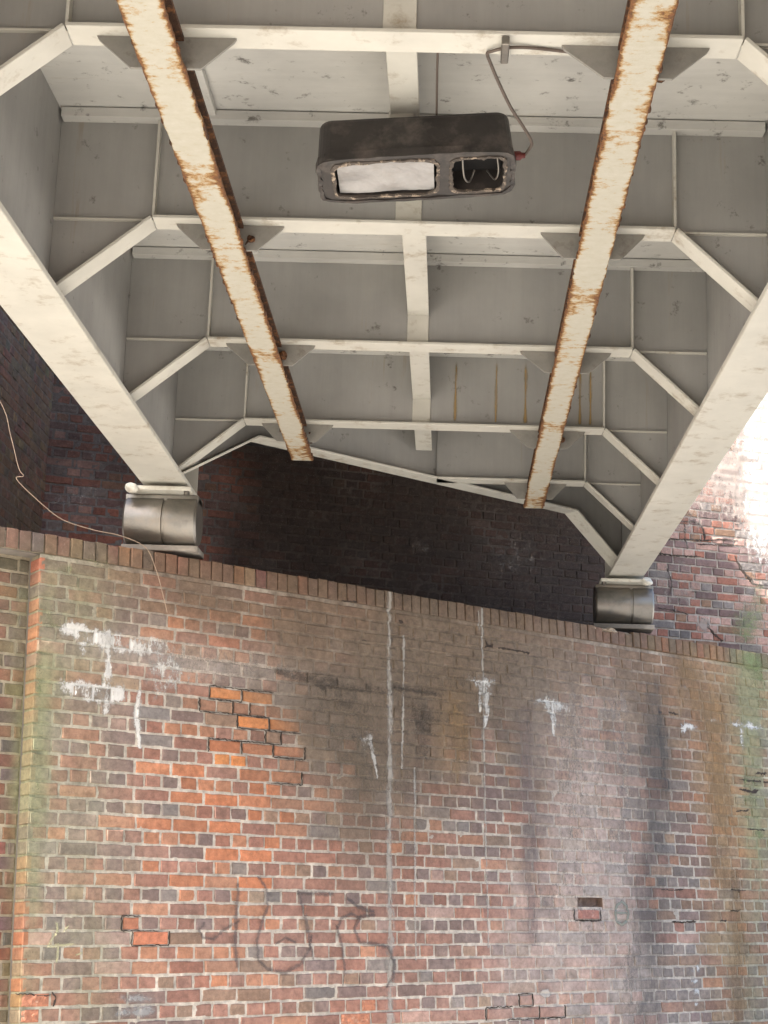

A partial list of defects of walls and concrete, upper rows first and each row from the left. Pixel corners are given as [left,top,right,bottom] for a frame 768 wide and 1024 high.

crack [658,521,768,642]
damp [59,622,257,748]
crack [198,685,306,786]
damp [469,608,495,863]
damp [534,688,629,797]
damp [339,592,417,1024]
crack [121,915,170,947]
spalling [573,896,603,922]